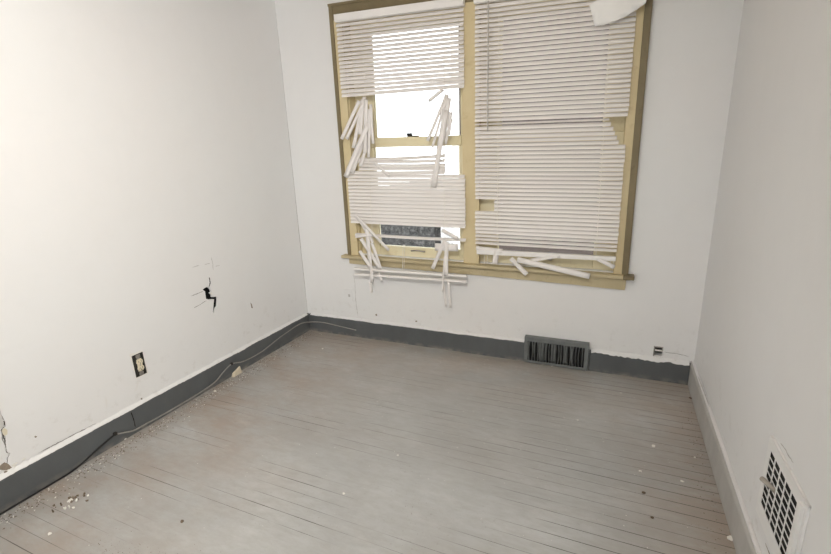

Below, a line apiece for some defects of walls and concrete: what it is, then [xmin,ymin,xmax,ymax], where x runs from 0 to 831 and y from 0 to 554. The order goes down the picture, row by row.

crack [0,411,9,474]
peeling [0,312,524,481]